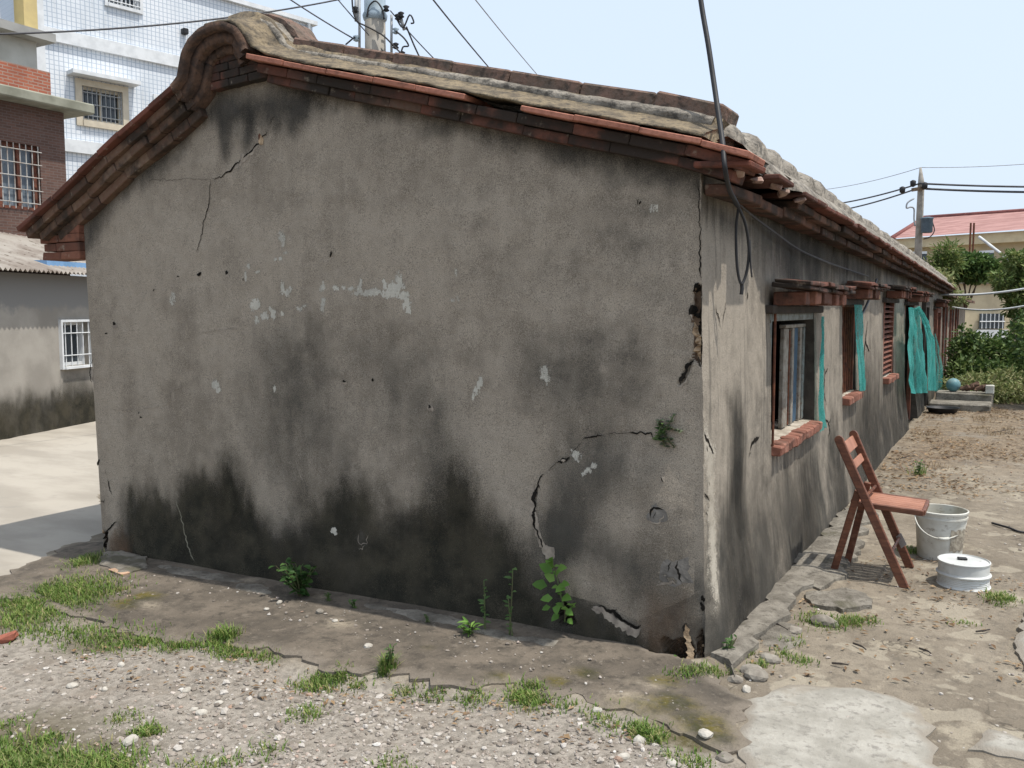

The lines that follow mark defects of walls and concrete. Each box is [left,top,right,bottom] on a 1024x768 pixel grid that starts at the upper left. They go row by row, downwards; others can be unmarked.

crack [151,116,275,252]
crack [696,187,704,277]
peeling [319,268,412,314]
spalling [678,283,703,387]
crack [100,474,118,549]
leakage [126,461,561,630]
leakage [540,441,637,573]
crack [529,431,653,559]
leakage [727,402,817,632]
leakage [576,608,660,652]
spalling [663,623,705,659]